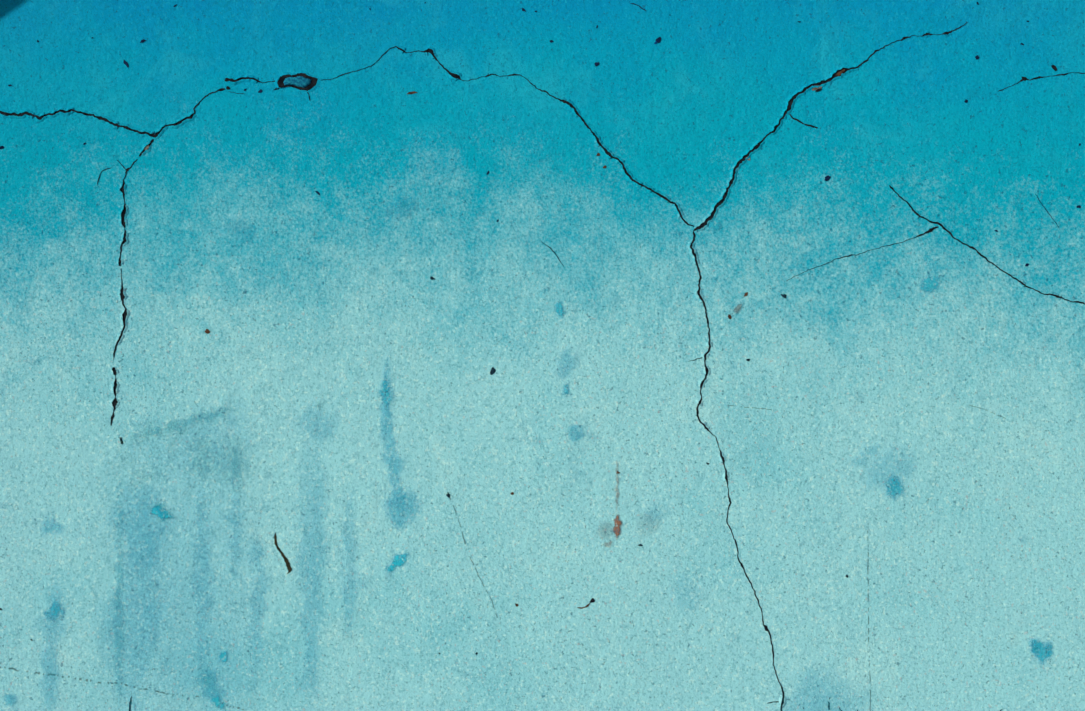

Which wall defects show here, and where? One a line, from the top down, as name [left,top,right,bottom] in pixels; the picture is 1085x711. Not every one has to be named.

crack [997,64,1085,92]
crack [0,74,275,425]
crack [788,185,1085,304]
crack [323,22,968,711]
water stain [150,506,171,519]
water stain [387,554,407,571]
crack [0,667,244,711]